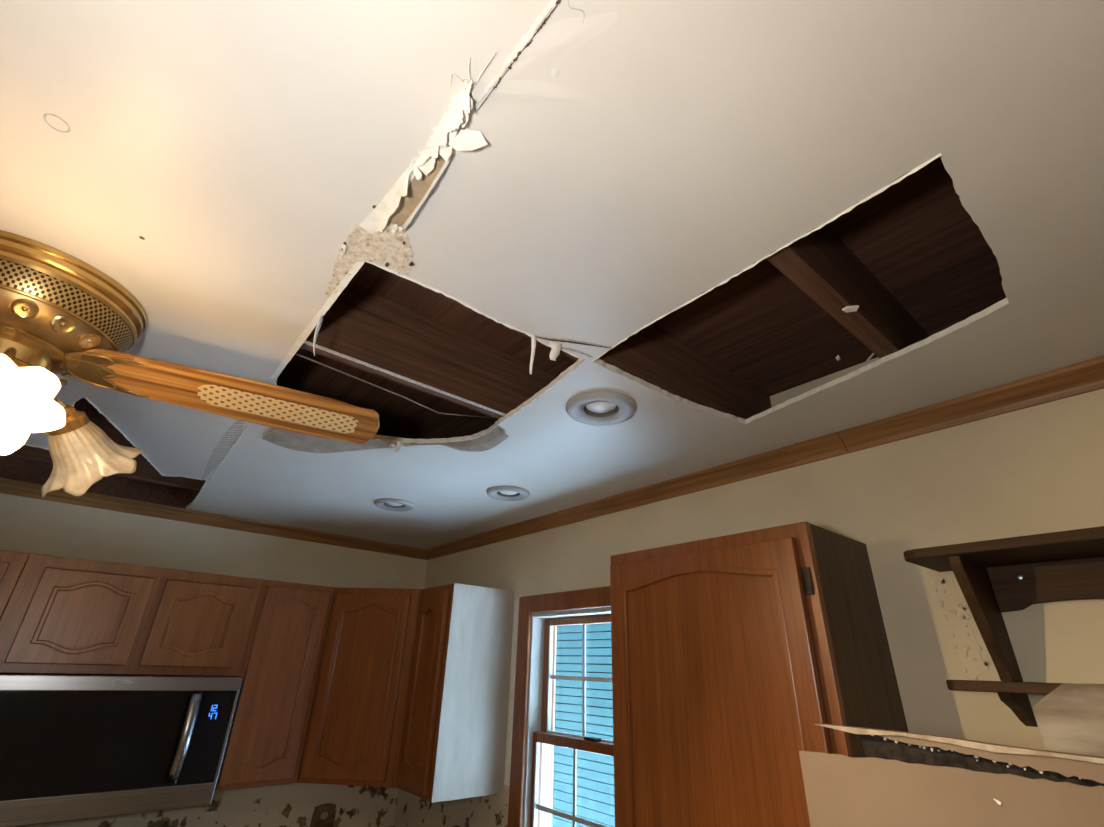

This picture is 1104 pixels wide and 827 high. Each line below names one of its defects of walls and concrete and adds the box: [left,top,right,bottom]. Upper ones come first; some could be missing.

crack [473,0,585,111]
peeling [412,89,473,180]
spalling [325,223,414,297]